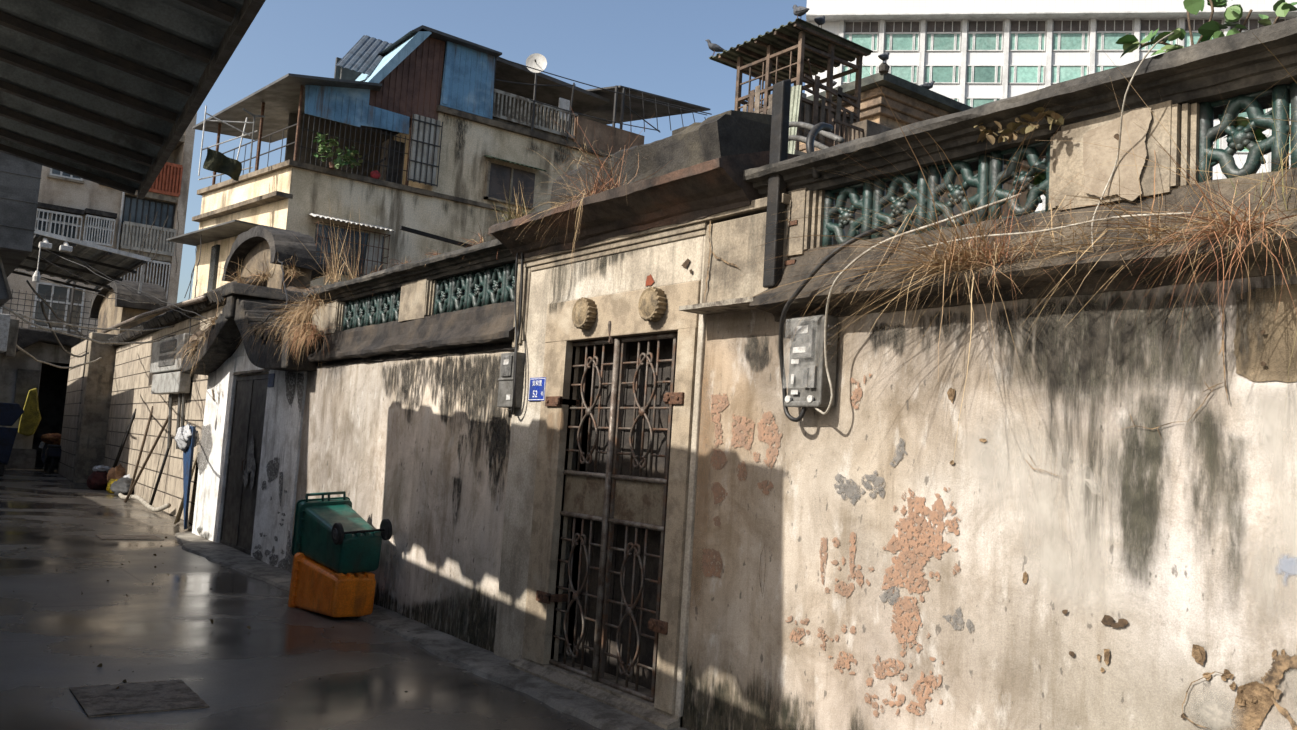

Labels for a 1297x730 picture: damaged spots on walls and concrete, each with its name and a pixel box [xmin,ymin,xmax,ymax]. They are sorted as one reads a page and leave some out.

leakage [382,355,510,521]
peeling [710,393,782,527]
leakage [871,312,967,353]
leakage [997,288,1215,488]
leakage [1120,400,1162,564]
leakage [1194,411,1241,562]
peeling [785,438,960,717]
peeling [942,607,974,632]
spalling [1192,644,1274,730]